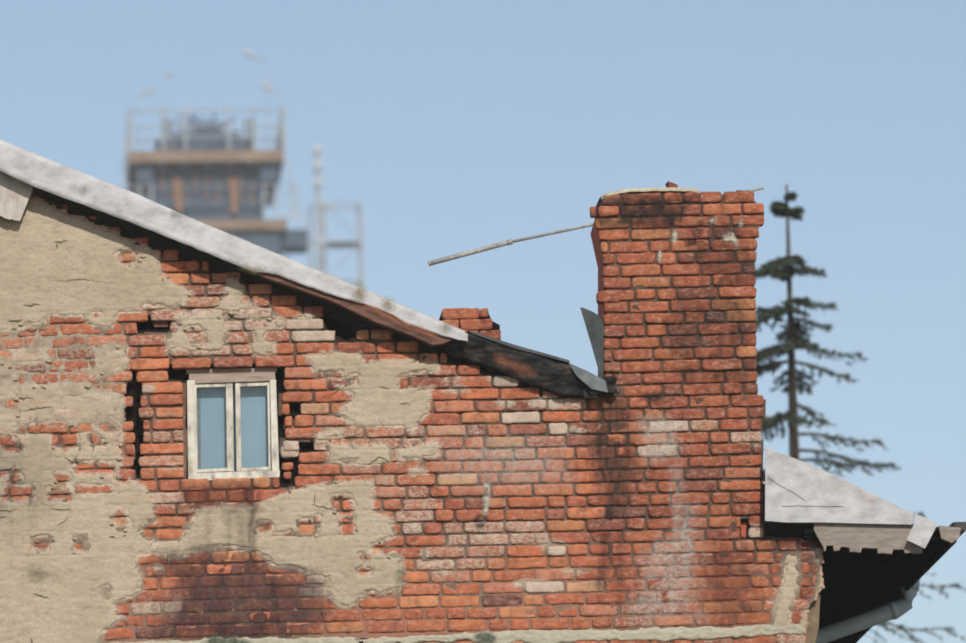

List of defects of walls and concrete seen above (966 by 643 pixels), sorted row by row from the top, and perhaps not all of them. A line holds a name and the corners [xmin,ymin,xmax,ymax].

crack [124,364,173,479]
flaking render [0,195,440,643]
water stain [173,559,319,639]
flaking render [773,548,825,643]